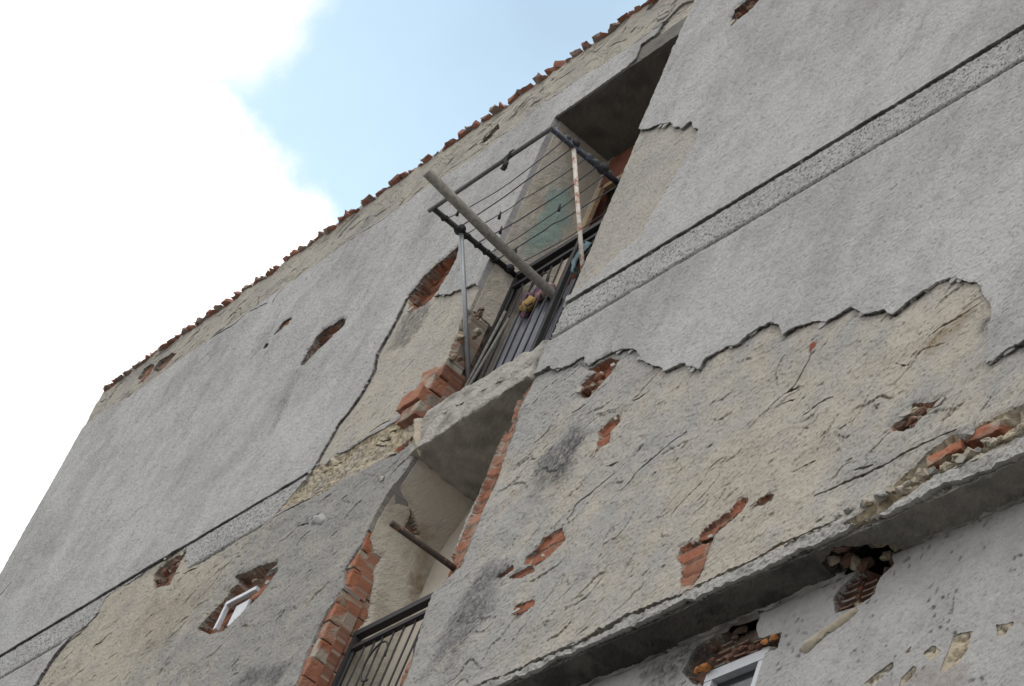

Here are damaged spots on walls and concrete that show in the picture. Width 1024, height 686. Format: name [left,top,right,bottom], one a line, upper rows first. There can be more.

peeling [39,251,490,686]
peeling [400,277,1024,686]